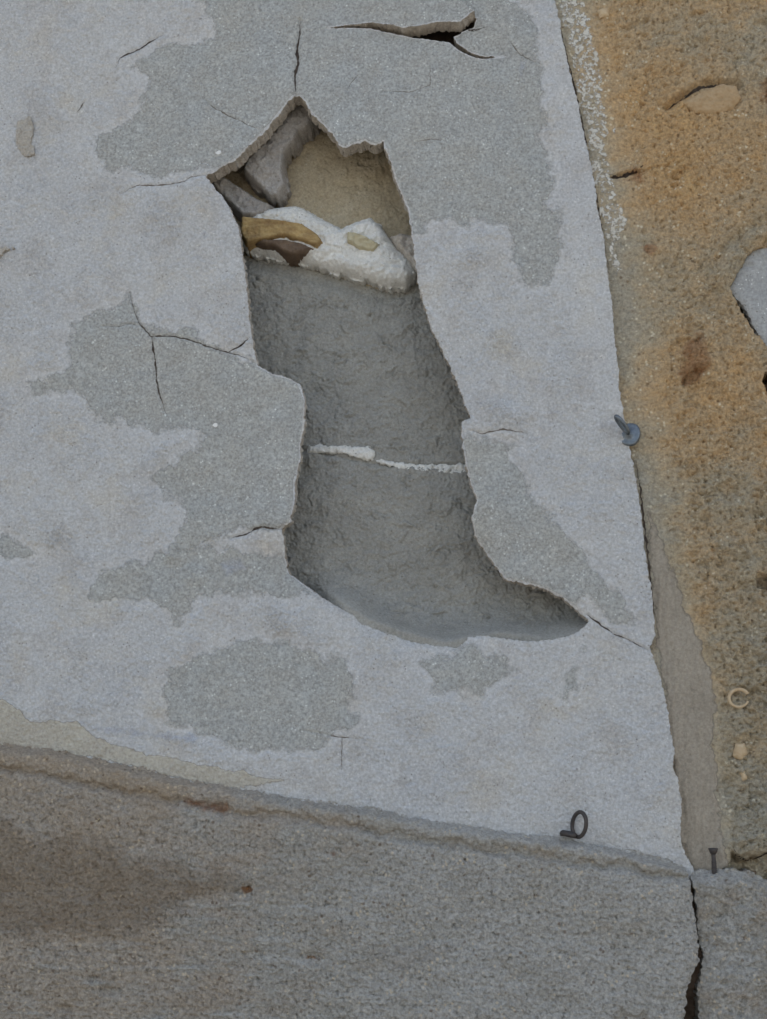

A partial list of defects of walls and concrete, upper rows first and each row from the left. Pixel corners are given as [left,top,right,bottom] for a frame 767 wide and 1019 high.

crack [412,22,485,47]
crack [116,294,251,406]
spalling [31,0,633,699]
crack [684,885,702,1019]